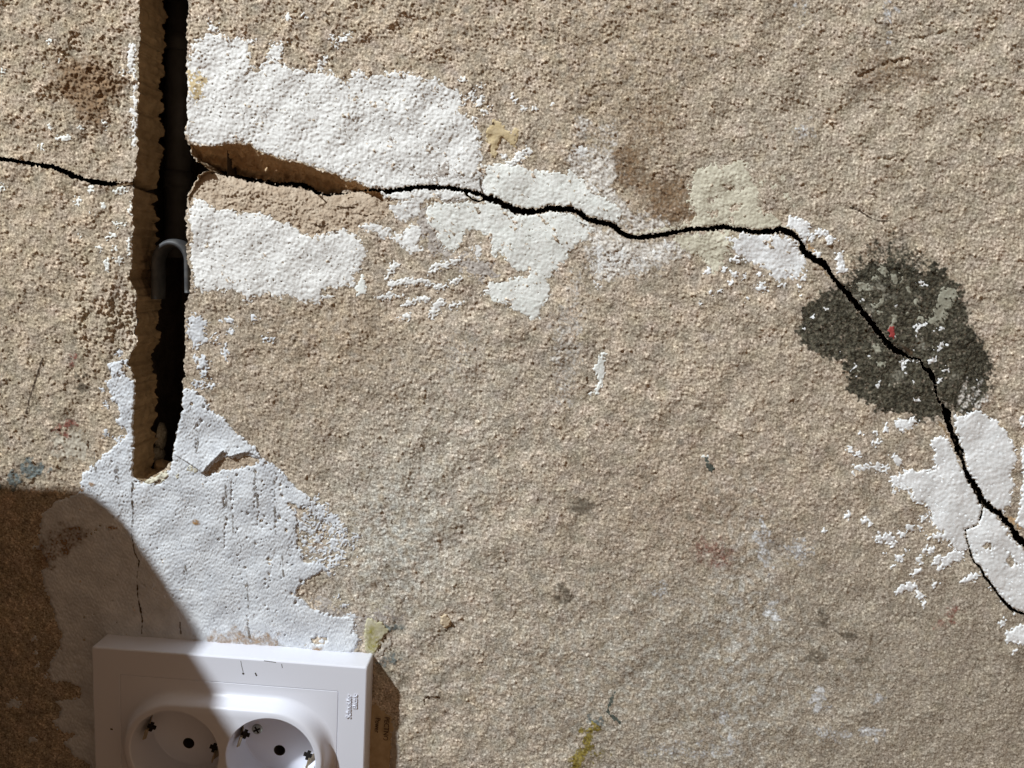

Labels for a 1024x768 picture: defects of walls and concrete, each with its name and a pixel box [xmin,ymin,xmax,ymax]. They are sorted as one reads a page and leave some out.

crack [0,157,135,187]
peeling [145,17,700,485]
damp [794,233,996,424]
crack [25,358,43,414]
peeling [99,349,131,410]
crack [197,162,1024,615]
peeling [845,416,920,476]
peeling [1015,445,1024,528]
crack [131,487,143,634]
peeling [844,510,982,609]
peeling [997,616,1024,655]